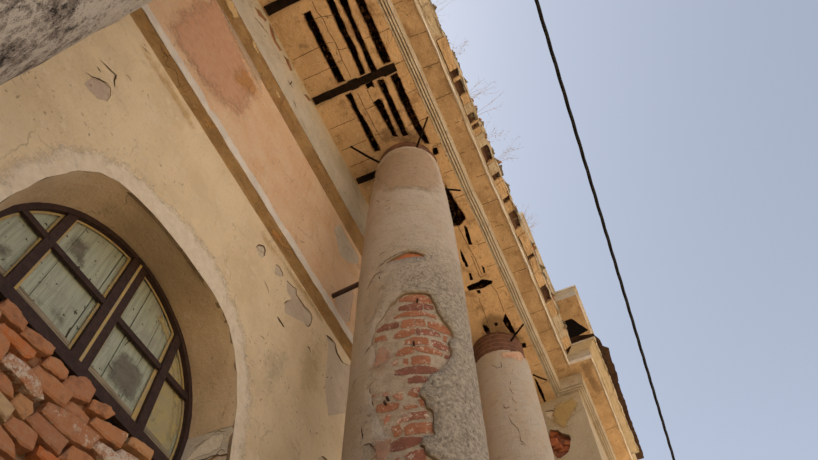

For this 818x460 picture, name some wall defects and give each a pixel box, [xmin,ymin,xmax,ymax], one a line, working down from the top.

leakage [173,0,257,114]
peeling [84,79,110,101]
peeling [275,265,312,326]
flaking render [366,294,452,460]
spalling [549,431,571,458]